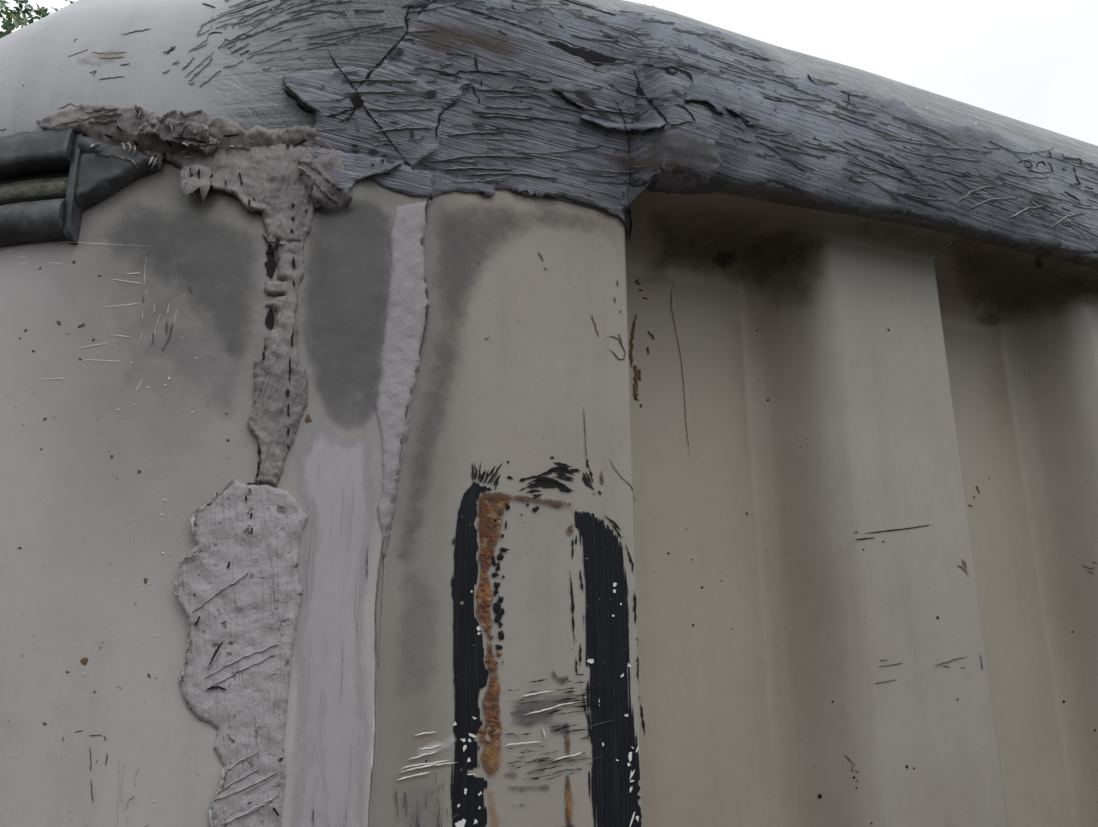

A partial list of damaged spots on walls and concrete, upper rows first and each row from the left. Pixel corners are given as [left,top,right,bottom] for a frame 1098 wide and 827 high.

crack [162,134,239,168]
crack [283,0,756,237]
peeling [556,69,666,132]
peeling [659,36,777,133]
rust [476,492,571,775]